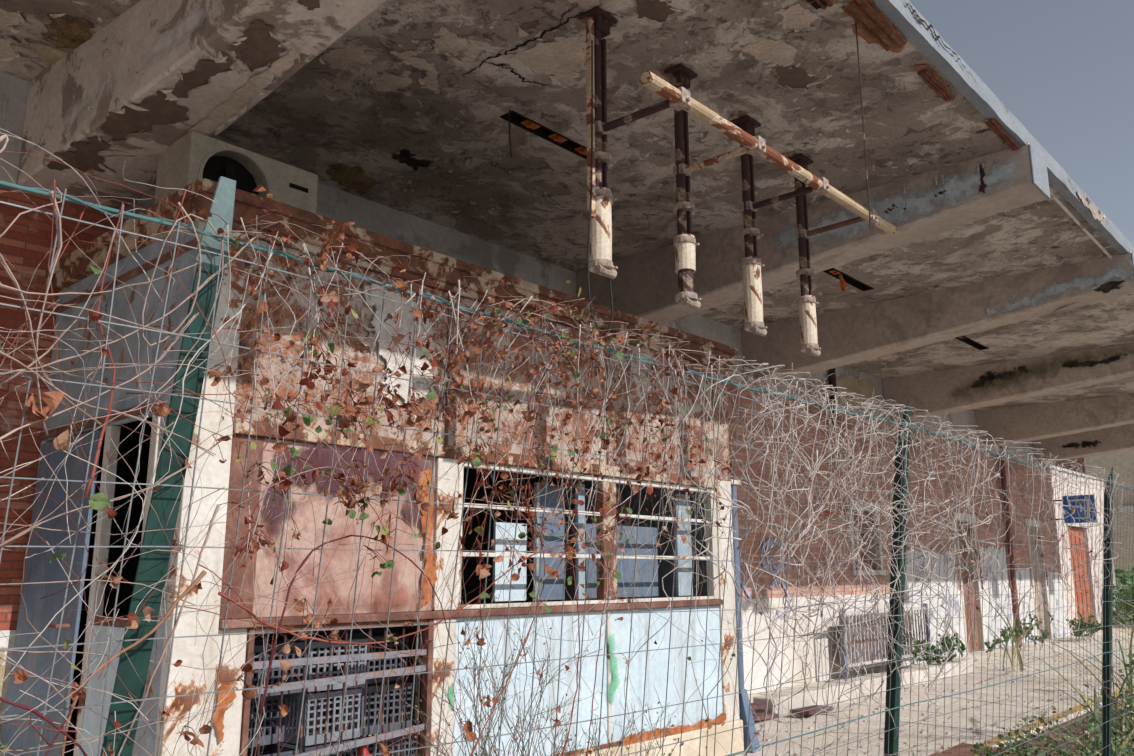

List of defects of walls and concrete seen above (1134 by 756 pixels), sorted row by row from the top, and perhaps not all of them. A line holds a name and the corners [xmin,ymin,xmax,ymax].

spalling [40,13,95,49]
peeling [368,27,471,94]
crack [463,4,615,85]
peeling [508,30,586,85]
peeling [634,0,681,22]
spalling [739,0,907,91]
peeling [46,20,300,175]
spalling [913,65,955,102]
spalling [984,118,1020,151]
spalling [326,164,385,196]
water stain [954,351,1131,395]
rust [621,712,727,746]